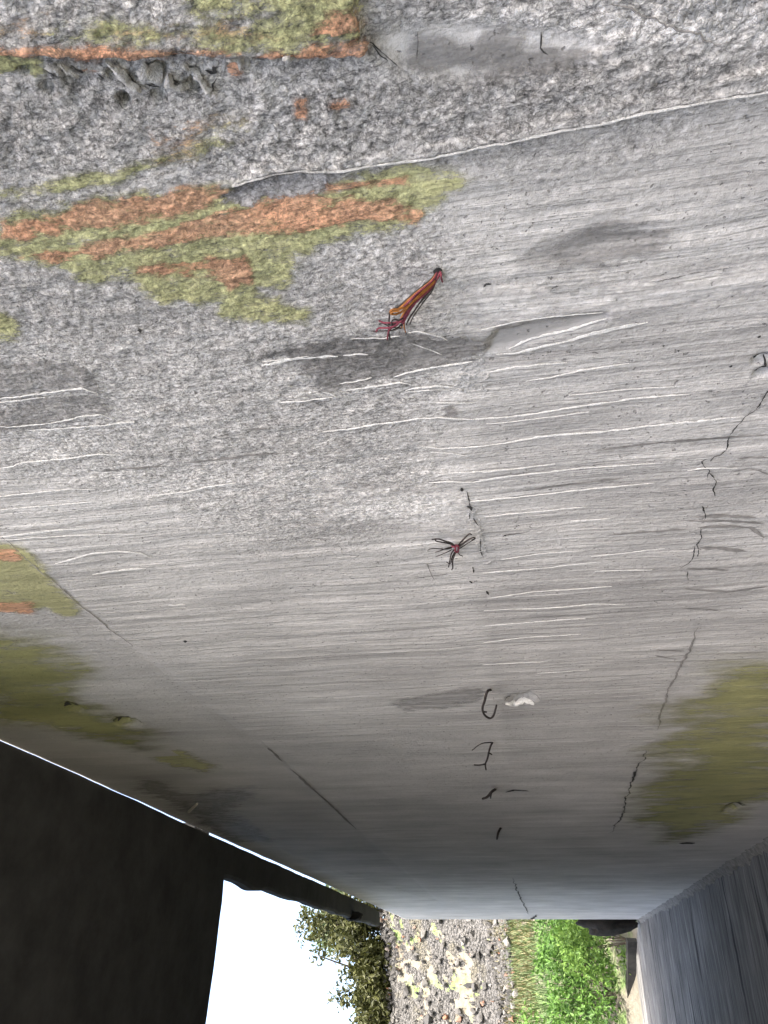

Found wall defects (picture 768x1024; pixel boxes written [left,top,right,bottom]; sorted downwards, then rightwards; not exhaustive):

spalling [71,59,107,79]
corrosion [0,45,242,76]
spalling [151,54,250,92]
corrosion [262,12,369,60]
corrosion [0,164,464,323]
crack [681,391,768,578]
leakage [0,640,148,748]
crack [610,628,698,833]